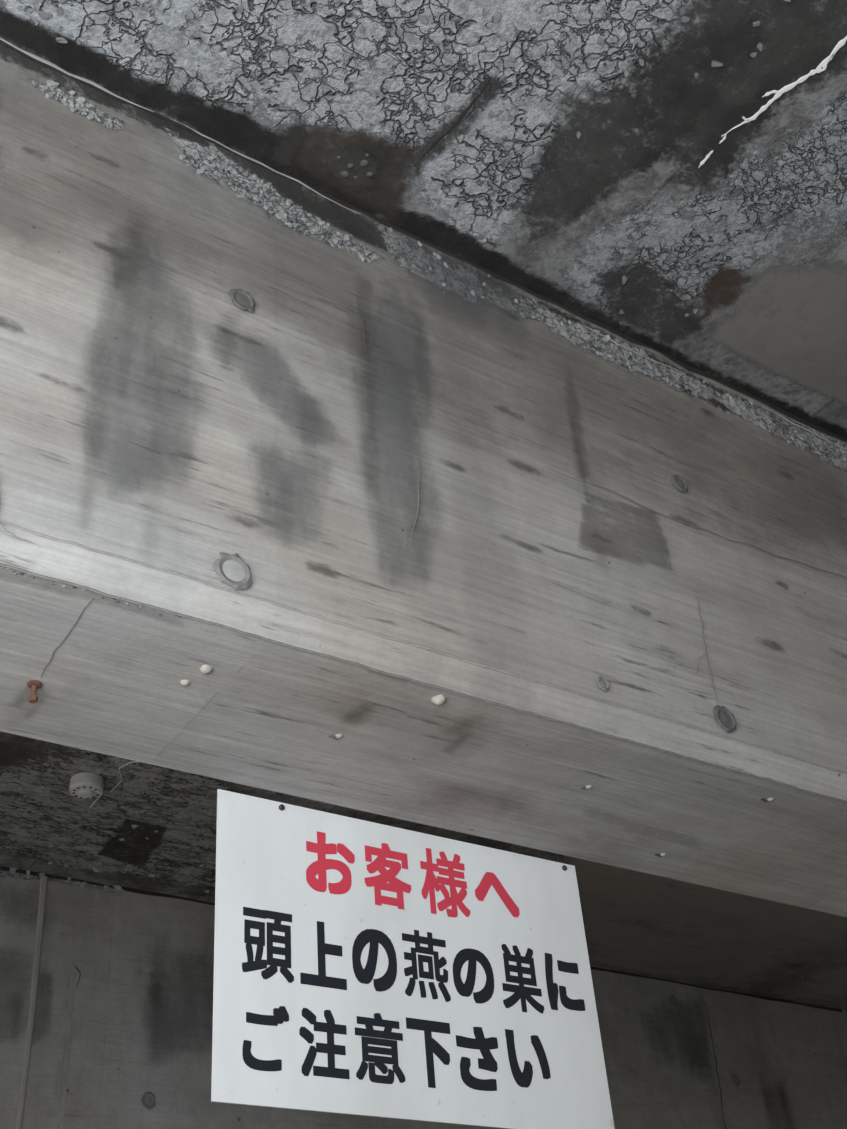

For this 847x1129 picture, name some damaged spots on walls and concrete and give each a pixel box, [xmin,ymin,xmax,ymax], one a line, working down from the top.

crack [512,23,597,101]
leakage [0,0,847,441]
crack [0,35,847,450]
peeling [165,128,847,471]
peeling [564,91,847,324]
crack [0,866,215,905]
leakage [0,790,216,896]
leakage [0,733,233,799]
crack [590,966,842,1129]